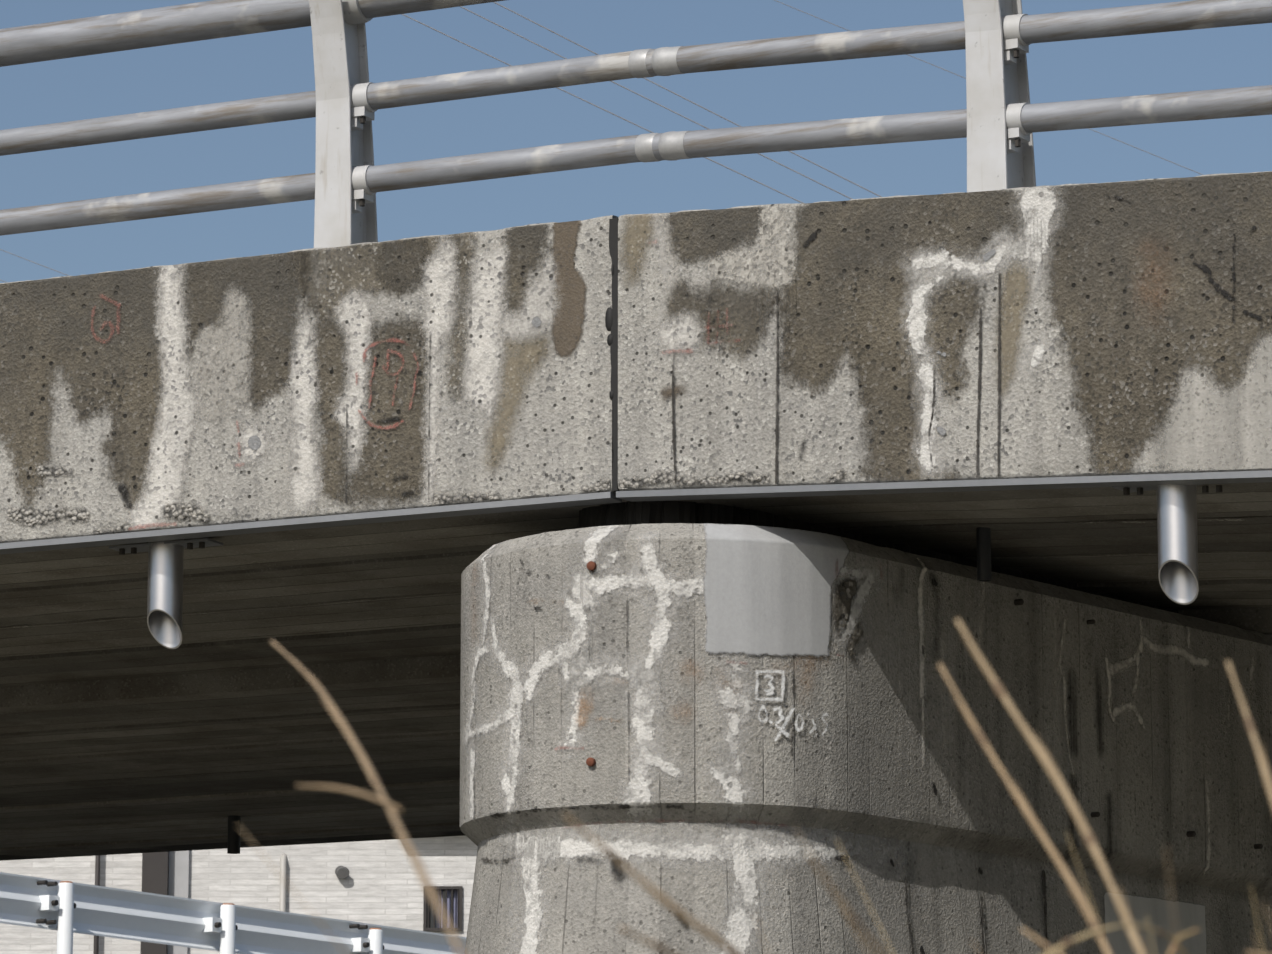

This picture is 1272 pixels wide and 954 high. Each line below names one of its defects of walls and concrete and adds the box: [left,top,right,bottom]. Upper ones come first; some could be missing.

water stain [0,220,586,530]
water stain [624,172,1272,481]
crack [465,525,914,954]
spalling [832,566,880,660]
crack [978,896,986,954]